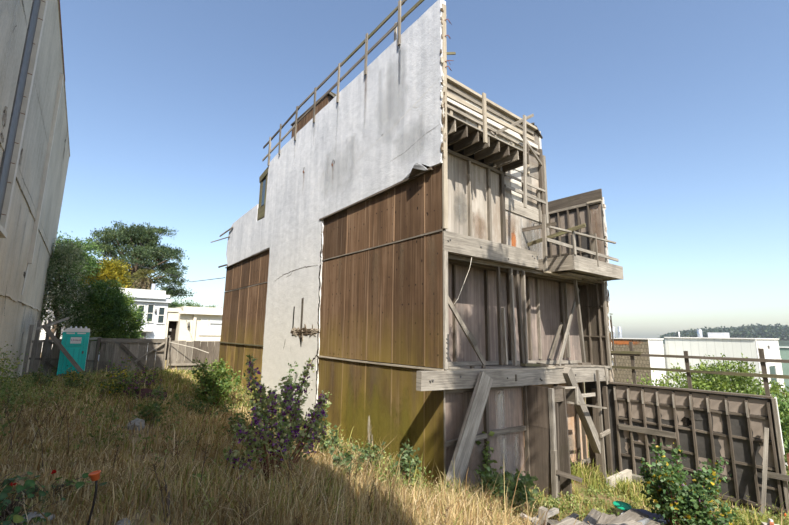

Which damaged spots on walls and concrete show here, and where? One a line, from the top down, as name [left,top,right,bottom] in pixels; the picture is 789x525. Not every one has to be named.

flaking render [440,49,456,159]
crack [278,223,322,405]